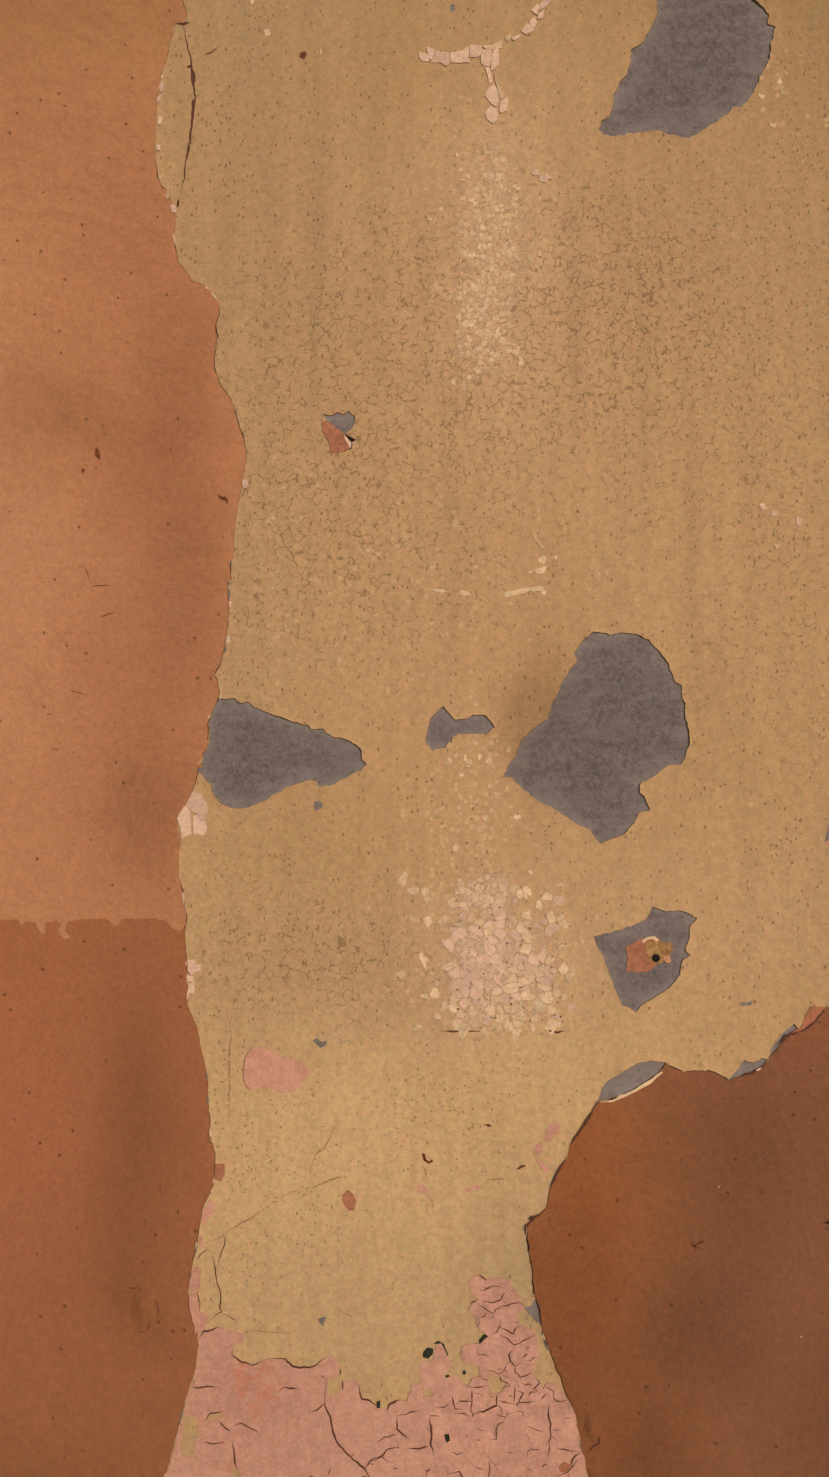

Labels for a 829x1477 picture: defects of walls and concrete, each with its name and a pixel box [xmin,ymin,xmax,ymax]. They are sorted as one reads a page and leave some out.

peeling [419,0,551,124]
spalling [598,0,784,138]
spalling [322,411,355,453]
peeling [503,534,557,597]
spalling [177,698,366,838]
spalling [397,631,697,1044]
peeling [187,959,201,993]
spalling [597,1060,666,1103]
spalling [730,1006,826,1079]
peeling [342,1190,357,1211]
crack [192,1127,600,1477]
peeling [165,1267,587,1477]